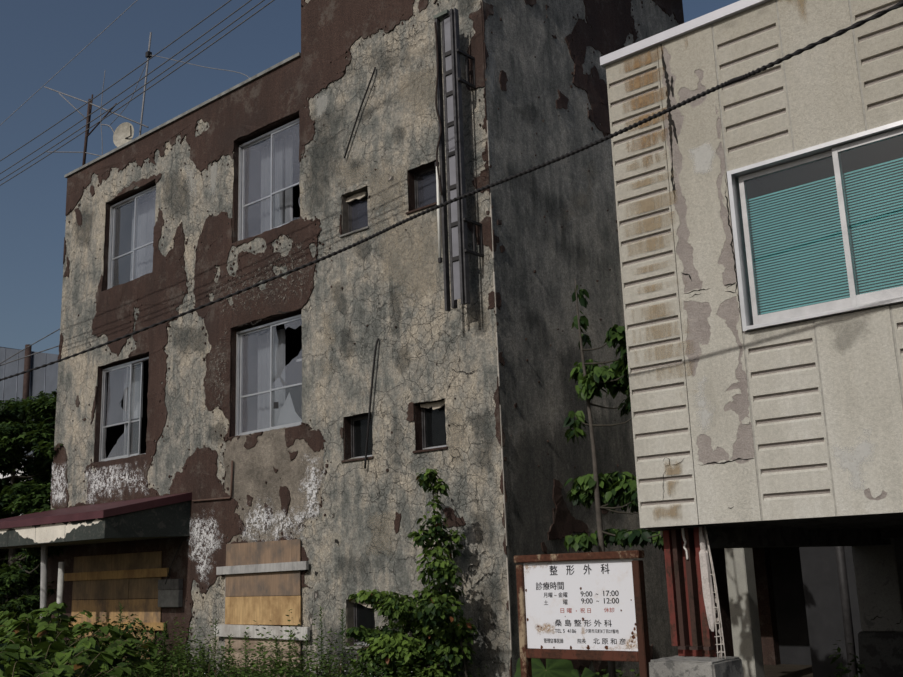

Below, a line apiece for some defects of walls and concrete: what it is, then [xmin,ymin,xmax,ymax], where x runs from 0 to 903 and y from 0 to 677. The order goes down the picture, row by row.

rust [625,51,667,161]
crack [660,44,678,200]
peeling [661,46,754,465]
crack [681,179,740,313]
peeling [50,0,679,677]
peeling [0,518,102,543]
efflorescence [86,465,143,504]
efflorescence [188,520,220,580]
efflorescence [243,455,321,540]